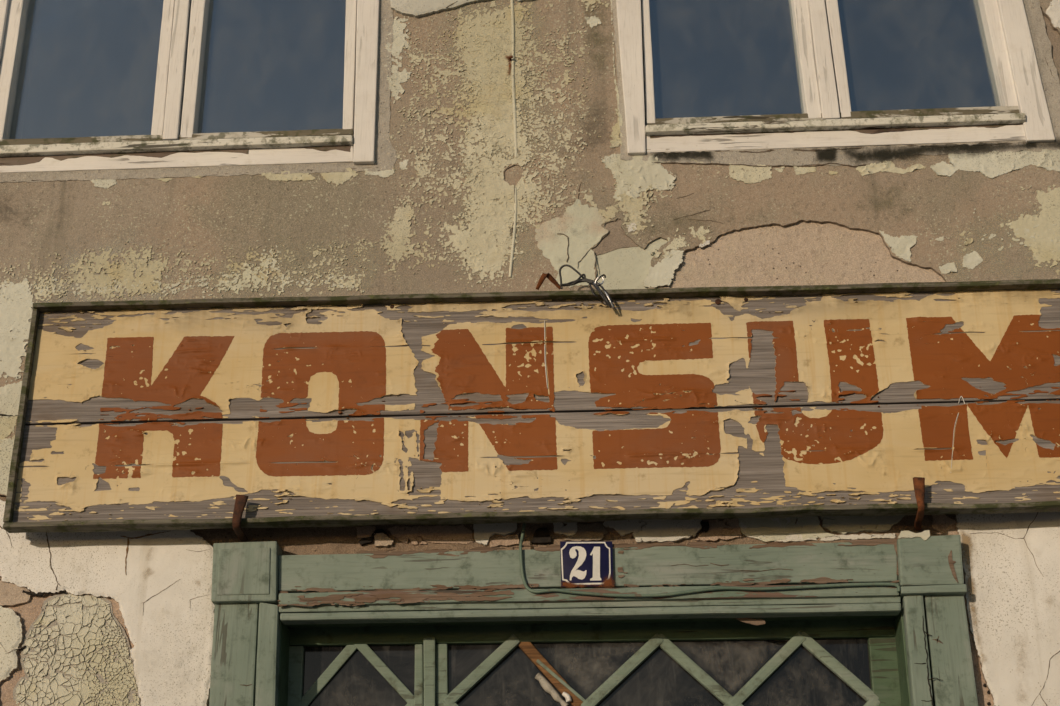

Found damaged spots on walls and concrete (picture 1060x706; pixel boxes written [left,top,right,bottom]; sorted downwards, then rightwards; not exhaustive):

flaking render [0,0,1060,495]
flaking render [0,578,67,706]
crack [22,532,66,596]
flaking render [106,598,134,649]
crack [120,531,210,575]
peeling [278,583,539,607]
flaking render [190,514,958,583]
peeling [618,567,693,588]
peeling [735,618,765,626]
peeling [948,550,965,583]
flaking render [964,594,994,706]
crack [970,512,1044,577]